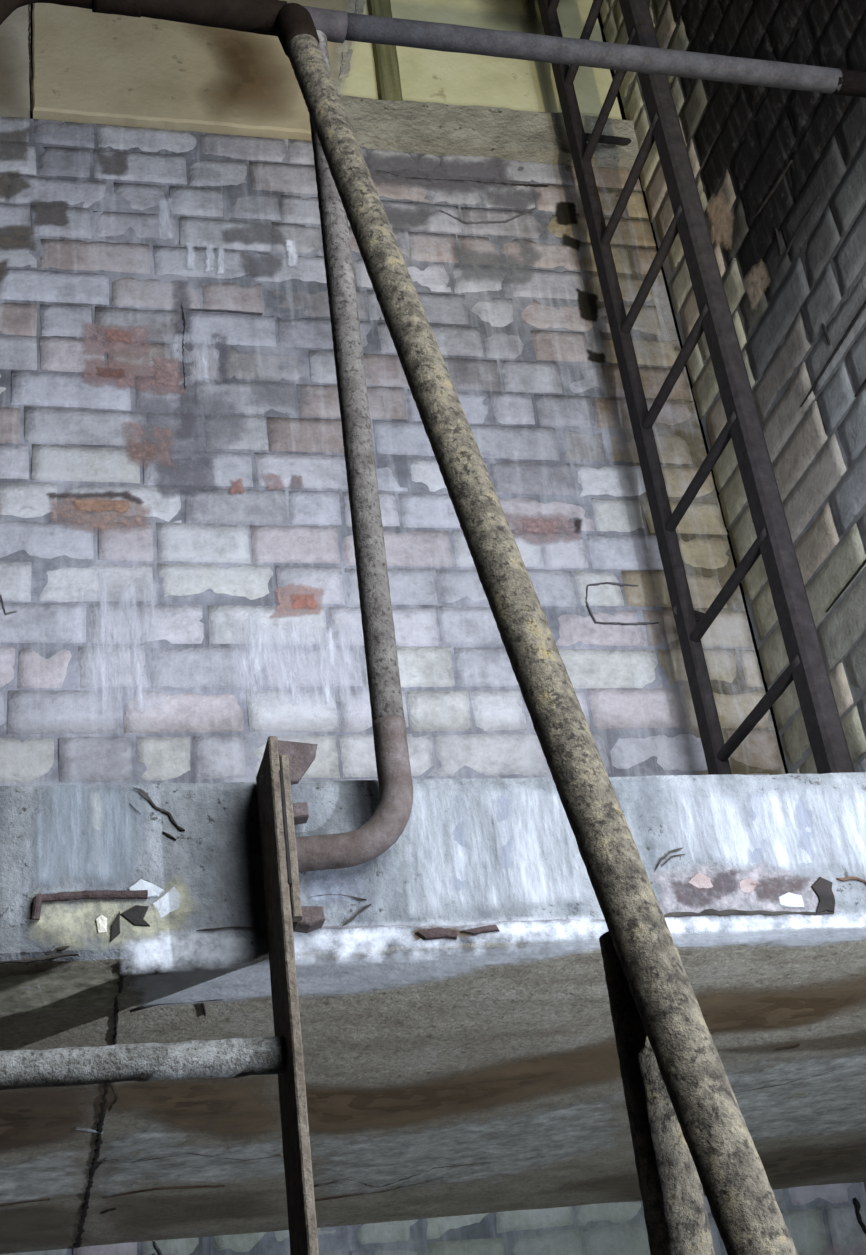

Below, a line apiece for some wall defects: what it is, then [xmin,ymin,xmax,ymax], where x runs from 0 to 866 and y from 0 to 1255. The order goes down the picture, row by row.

damp [213,30,277,104]
peeling [707,194,733,246]
peeling [746,264,768,308]
peeling [84,323,184,393]
peeling [48,491,147,530]
peeling [272,584,321,617]
spalling [654,865,835,918]
crack [836,876,866,885]
crack [112,963,224,1045]
crack [74,1083,146,1248]